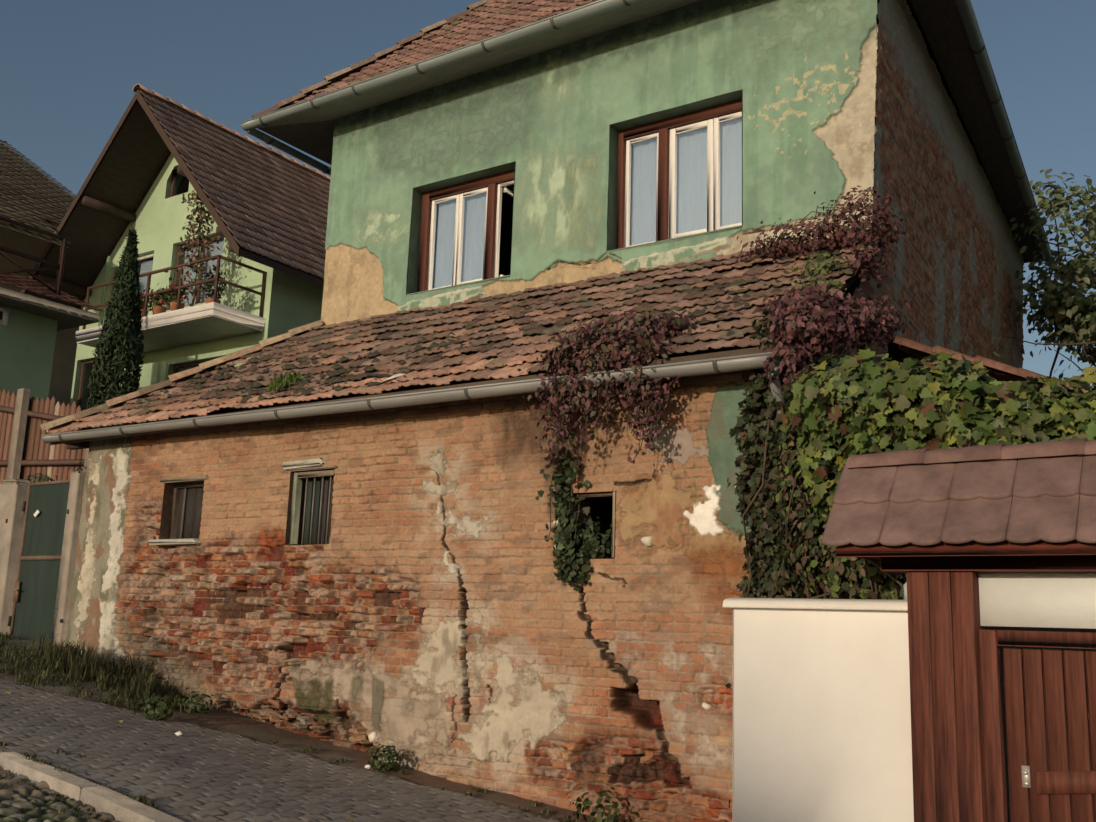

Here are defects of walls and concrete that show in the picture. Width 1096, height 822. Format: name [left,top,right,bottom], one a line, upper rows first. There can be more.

spalling [714,24,878,265]
spalling [318,243,400,334]
spalling [461,253,632,310]
spalling [683,484,723,536]
spalling [74,446,425,697]
crack [436,472,493,743]
crack [578,564,638,684]
crack [656,726,690,784]